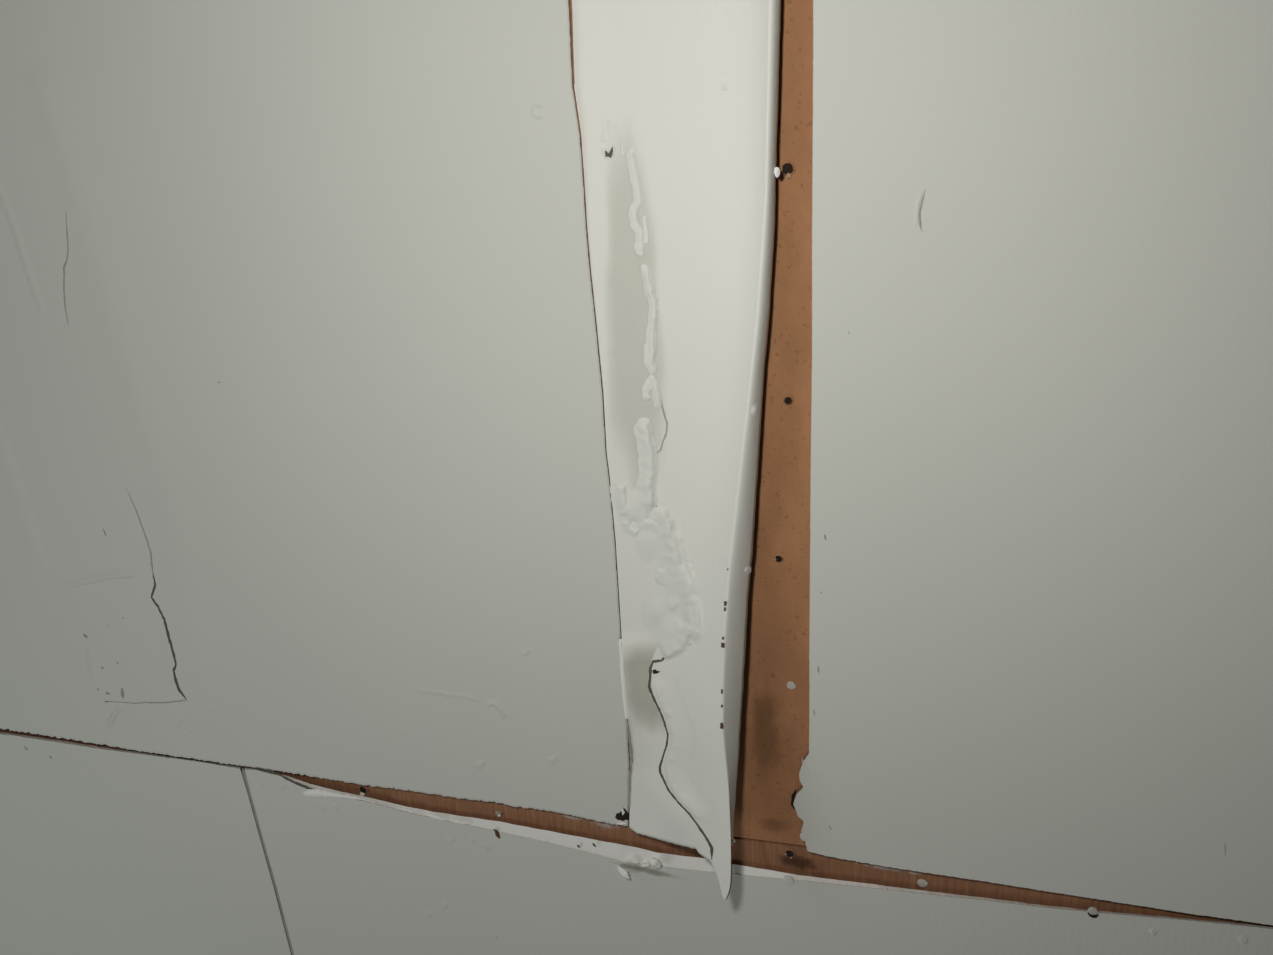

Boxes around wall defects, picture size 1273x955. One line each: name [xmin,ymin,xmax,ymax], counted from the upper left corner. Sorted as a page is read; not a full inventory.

peeling [570,0,781,900]
crack [108,491,187,704]
peeling [303,789,383,805]
peeling [398,808,469,824]